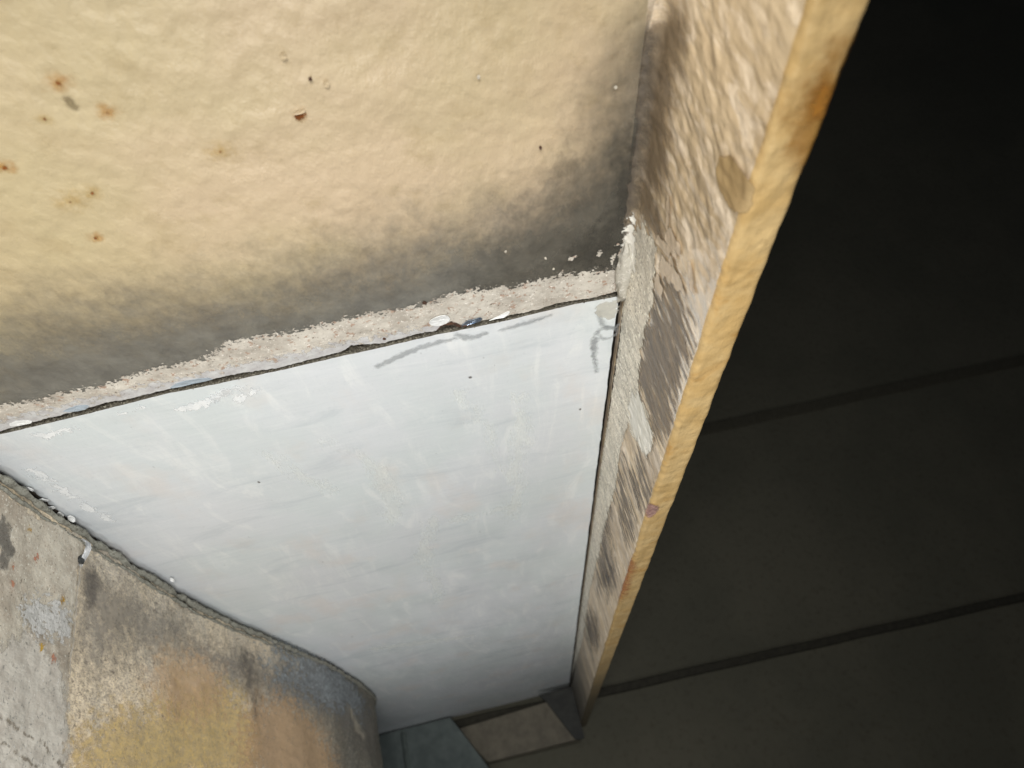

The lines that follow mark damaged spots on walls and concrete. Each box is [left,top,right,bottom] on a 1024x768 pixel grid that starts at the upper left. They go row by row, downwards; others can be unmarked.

leakage [573,169,631,268]
peeling [571,215,657,678]